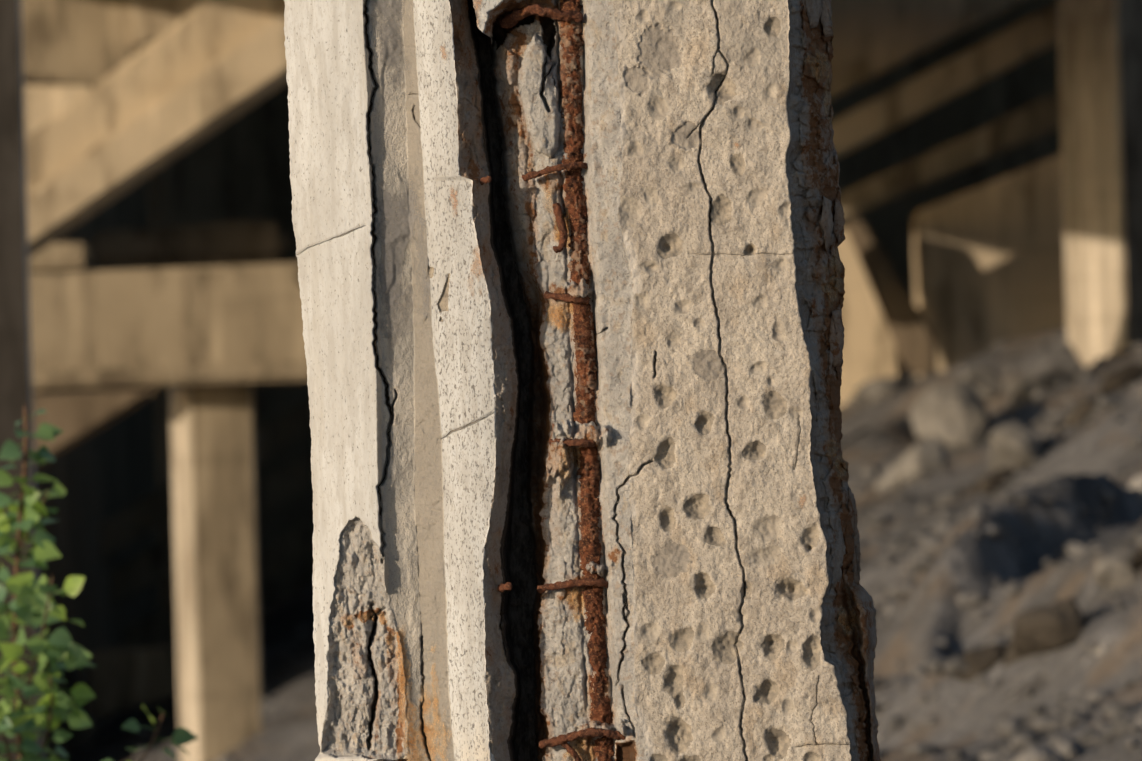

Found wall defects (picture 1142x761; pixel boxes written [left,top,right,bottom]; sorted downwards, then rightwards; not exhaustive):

crack [300,0,397,563]
crack [441,0,555,761]
corrosion [546,303,574,331]
spalling [488,0,881,761]
crack [688,0,794,761]
spalling [320,517,409,761]
crack [368,609,381,748]
corrosion [364,613,446,761]
crack [421,638,431,761]
corrosion [567,587,584,619]
crack [613,460,653,737]